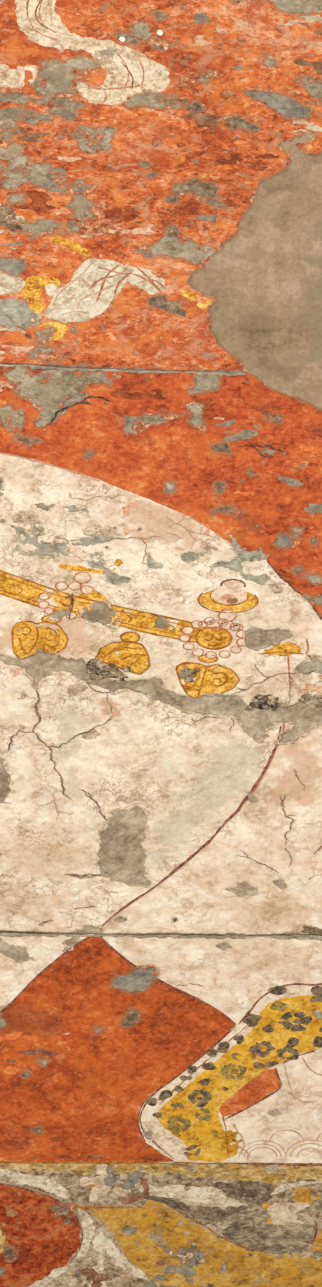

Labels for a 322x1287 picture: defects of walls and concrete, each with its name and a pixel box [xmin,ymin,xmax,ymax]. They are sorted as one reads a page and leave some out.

flaking render [0,0,322,278]
flaking render [0,291,322,487]
flaking render [175,467,322,593]
flaking render [292,565,322,606]
flaking render [16,652,131,730]
flaking render [179,667,224,696]
flaking render [0,756,15,803]
crack [6,679,151,821]
flaking render [96,806,153,888]
peeling [193,1205,250,1224]
peeling [267,1202,310,1225]
peeling [143,1245,206,1287]